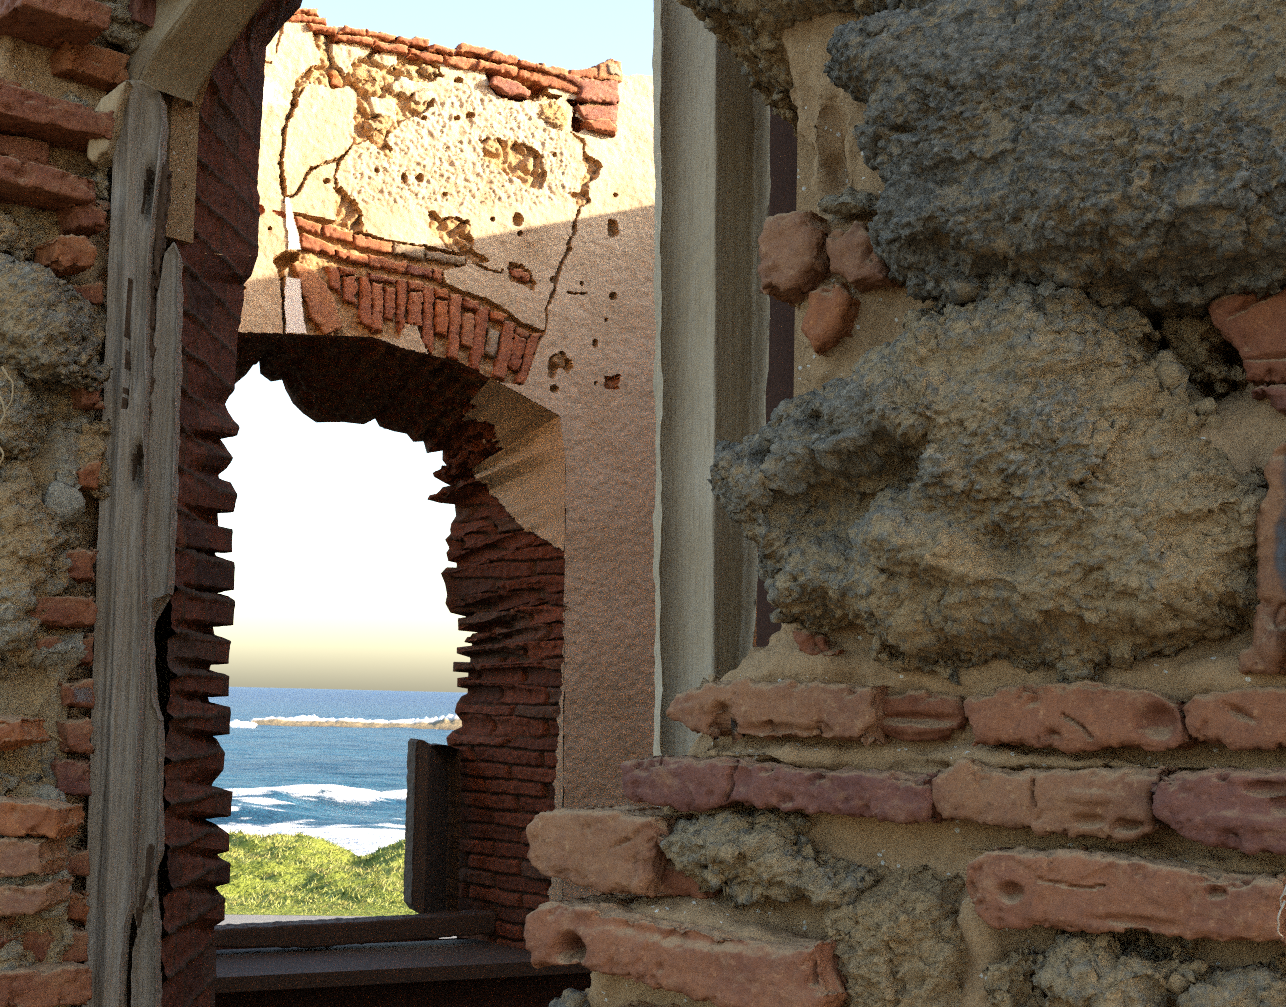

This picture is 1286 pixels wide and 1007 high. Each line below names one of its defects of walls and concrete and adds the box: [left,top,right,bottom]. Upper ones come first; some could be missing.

spalling [291,31,464,173]
spalling [504,75,562,129]
crack [258,97,354,203]
spalling [401,172,424,184]
spalling [478,137,557,190]
spalling [428,210,490,264]
spalling [512,212,524,237]
crack [273,249,301,338]
crack [474,262,504,274]
spalling [507,262,555,291]
crack [541,208,588,334]